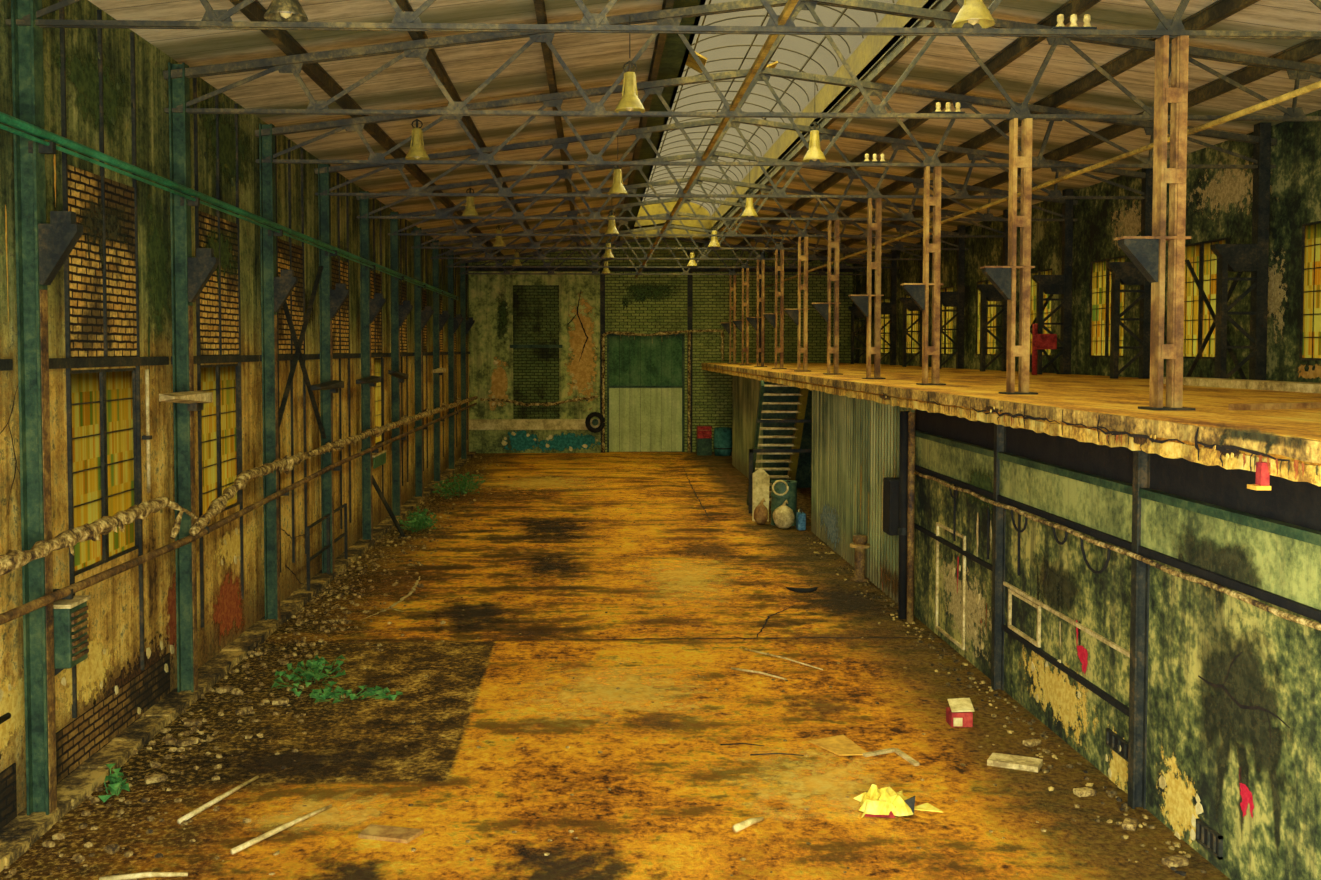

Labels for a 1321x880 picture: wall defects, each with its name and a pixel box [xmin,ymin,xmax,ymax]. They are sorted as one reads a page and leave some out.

damp [967,468,1001,557]
damp [1036,558,1088,674]
damp [1178,534,1261,613]
peeling [0,676,25,759]
peeling [1020,645,1128,793]
damp [1199,629,1293,852]
peeling [1157,747,1203,849]